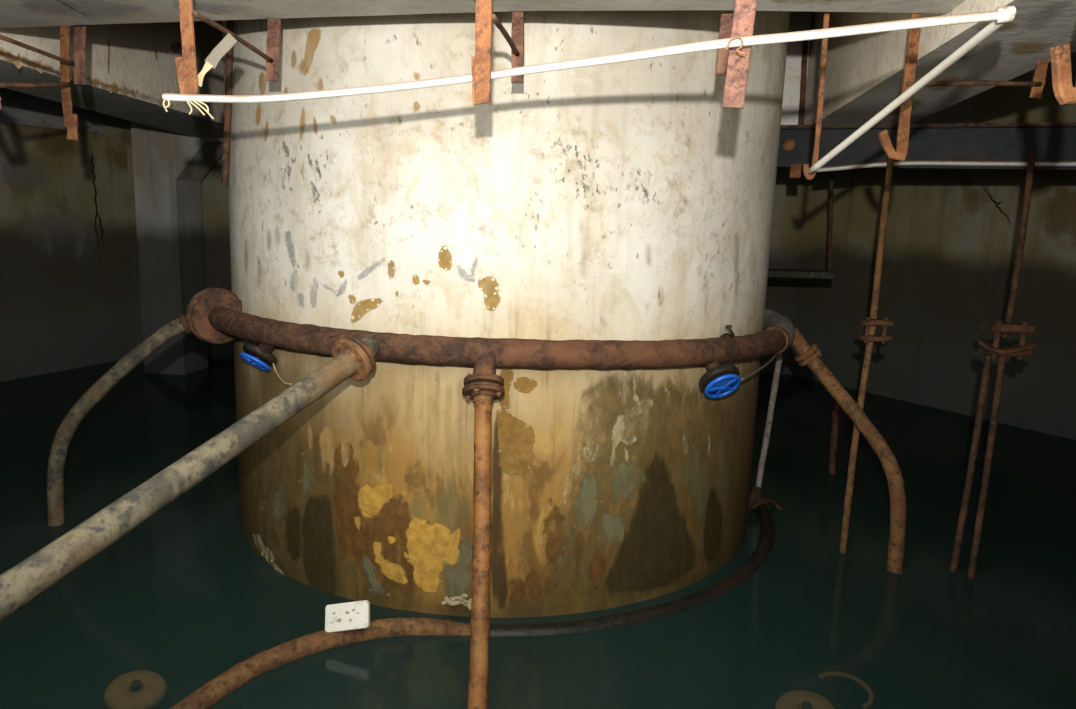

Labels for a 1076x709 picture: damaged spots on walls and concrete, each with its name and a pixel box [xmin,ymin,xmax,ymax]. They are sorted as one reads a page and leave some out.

corrosion [292,29,320,74]
corrosion [300,109,317,138]
damp [610,376,653,467]
damp [287,496,335,594]
corrosion [309,427,414,595]
corrosion [492,377,735,608]
damp [606,456,722,592]